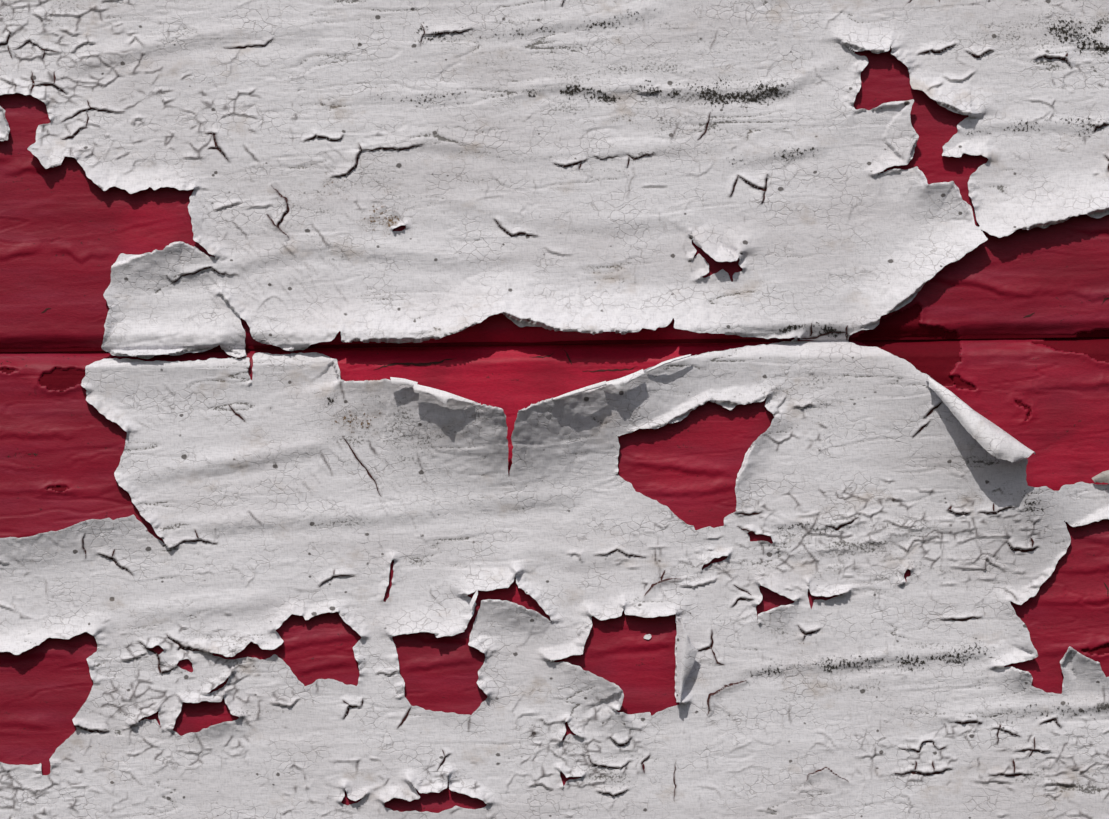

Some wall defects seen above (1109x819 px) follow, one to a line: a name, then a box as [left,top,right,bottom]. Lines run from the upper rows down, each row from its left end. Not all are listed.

crack [0,31,119,140]
peeling [0,86,811,559]
peeling [836,34,1109,704]
peeling [0,625,107,786]
peeling [167,691,251,747]
peeling [196,602,372,696]
peeling [386,564,563,726]
peeling [539,598,698,725]
crack [589,737,648,797]
crack [895,741,952,776]
crack [955,718,1061,777]